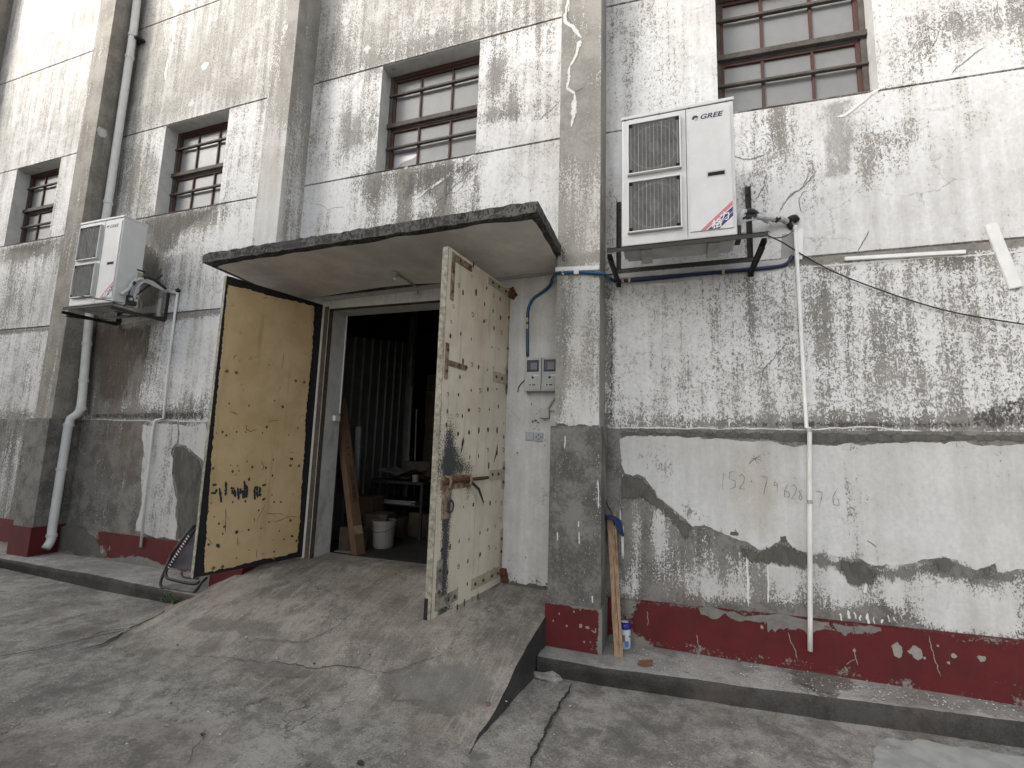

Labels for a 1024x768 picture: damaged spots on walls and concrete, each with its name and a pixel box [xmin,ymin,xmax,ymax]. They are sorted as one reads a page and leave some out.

peeling [619,435,1024,573]
peeling [699,606,881,636]